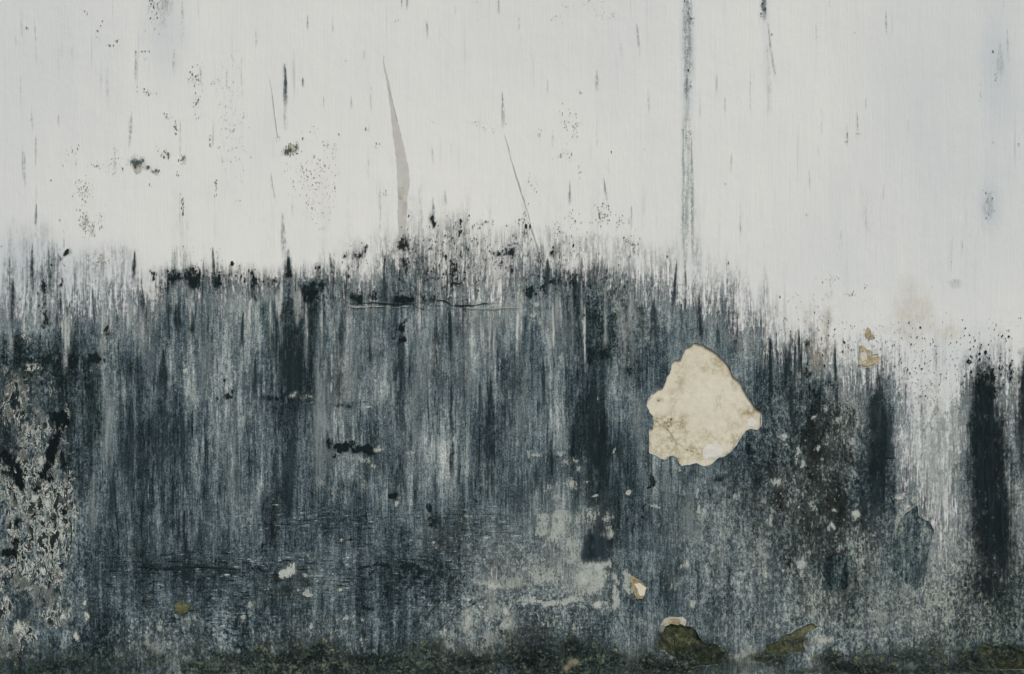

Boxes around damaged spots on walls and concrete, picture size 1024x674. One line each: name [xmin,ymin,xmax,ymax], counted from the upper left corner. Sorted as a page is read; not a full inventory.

leakage [112,148,185,186]
leakage [681,118,694,243]
leakage [0,179,1024,674]
peeling [414,450,647,661]
spalling [628,343,1024,670]
peeling [858,327,881,368]